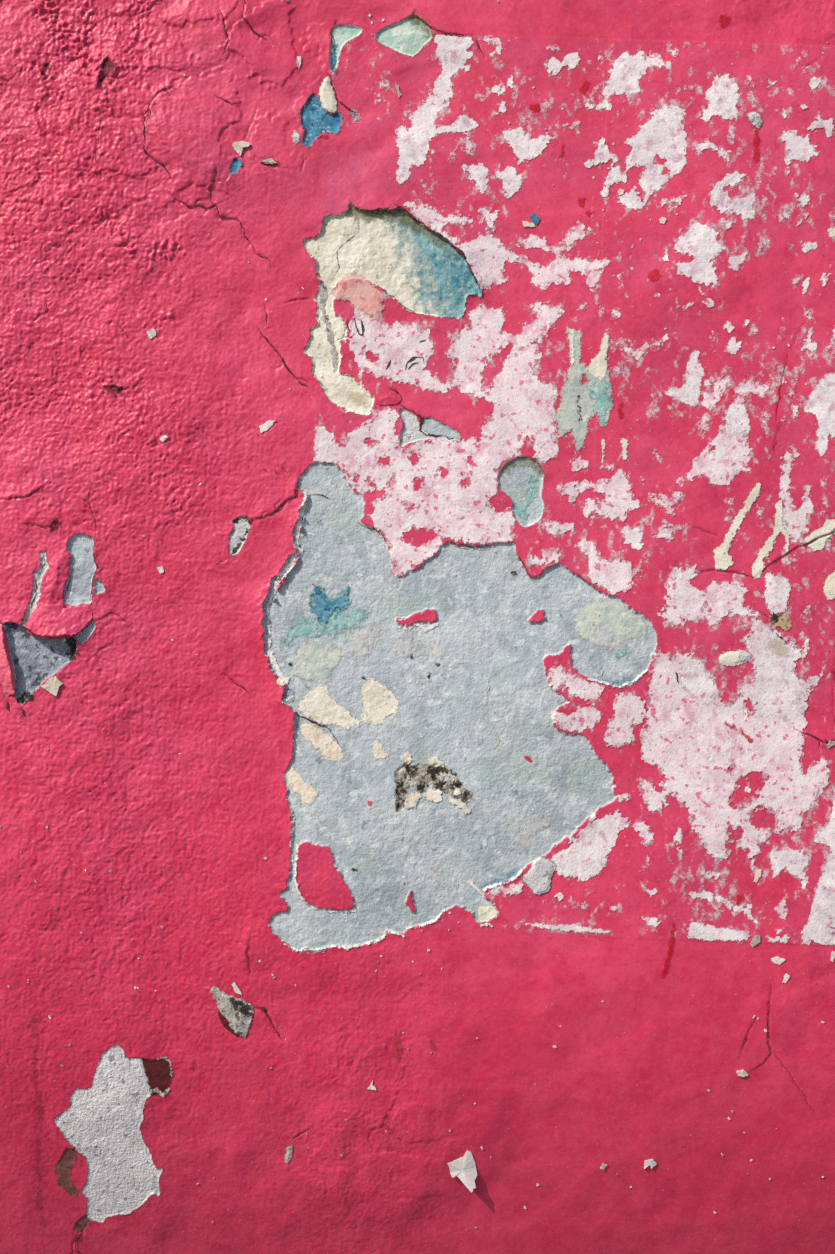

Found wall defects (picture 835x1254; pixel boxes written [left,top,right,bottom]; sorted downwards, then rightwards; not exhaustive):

crack [219,0,267,62]
peeling [291,10,476,148]
crack [143,77,271,269]
peeling [304,202,482,447]
peeling [497,442,545,527]
peeling [0,517,105,718]
peeling [261,463,658,954]
peeling [718,649,752,667]
crack [697,532,834,578]
peeling [210,982,279,1038]
peeling [54,1045,174,1232]
peeling [447,1150,477,1193]